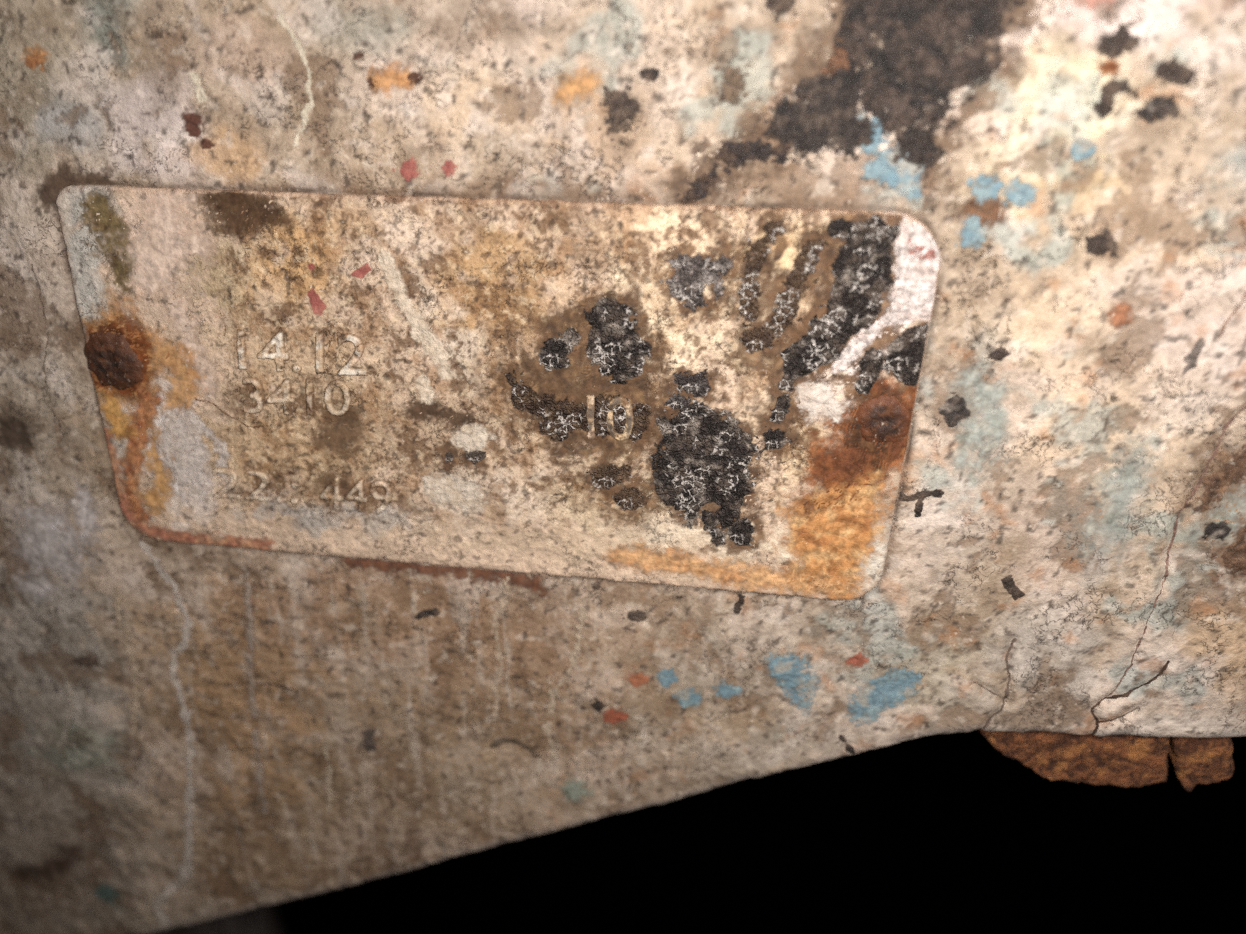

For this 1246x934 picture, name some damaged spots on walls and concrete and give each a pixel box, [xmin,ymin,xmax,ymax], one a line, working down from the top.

corrosion [82,298,274,550]
corrosion [608,377,917,600]
crack [1090,403,1246,735]
crack [1217,292,1246,338]
crack [973,638,1017,730]